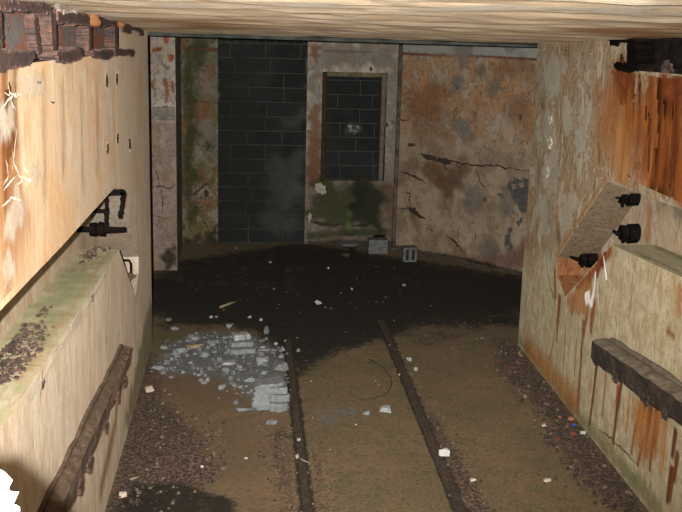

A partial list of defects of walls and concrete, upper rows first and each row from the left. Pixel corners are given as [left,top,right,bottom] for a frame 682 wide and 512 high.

spalling [54,4,85,15]
crack [399,171,476,251]
crack [418,153,529,193]
peeling [498,177,529,252]
rust [613,71,682,201]
rust [549,248,612,412]
rust [612,382,622,444]
rust [626,396,679,503]